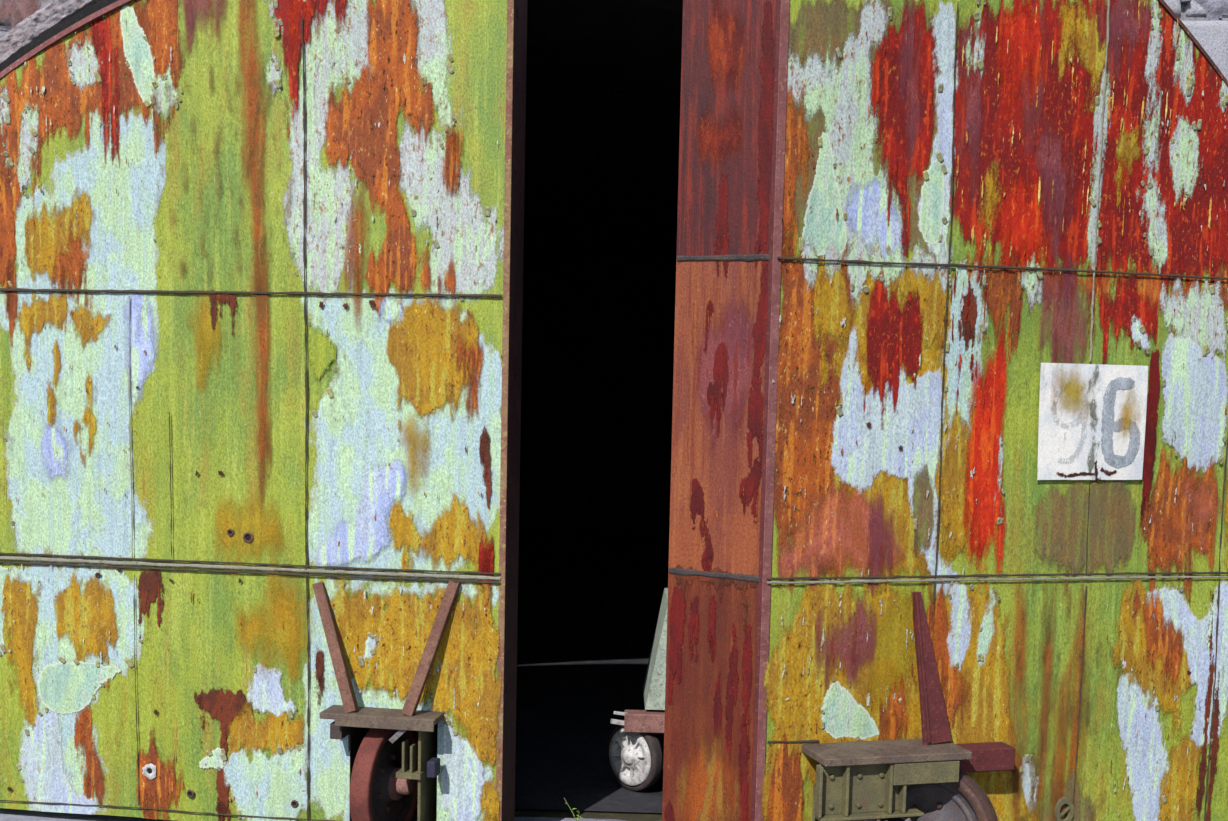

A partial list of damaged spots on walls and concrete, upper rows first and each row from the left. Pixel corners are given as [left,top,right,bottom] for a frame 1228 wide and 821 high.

rust [1,567,42,730]
rust [54,572,118,691]
rust [0,0,183,465]
peeling [0,5,183,814]
rust [194,688,304,821]
peeling [199,0,504,821]
rust [324,0,501,821]
peeling [820,662,902,741]
peeling [787,0,1008,670]
rust [664,0,1228,821]
peeling [1111,659,1185,821]
peeling [1133,580,1228,756]